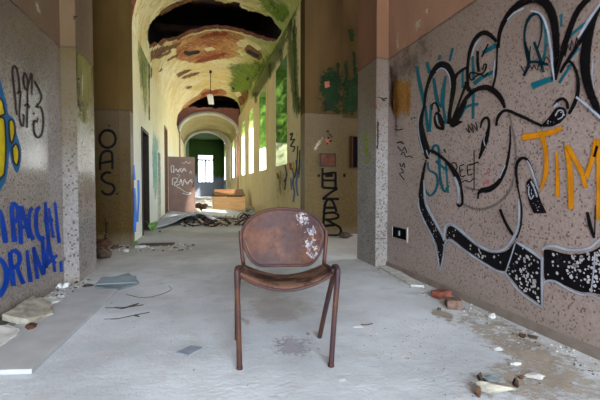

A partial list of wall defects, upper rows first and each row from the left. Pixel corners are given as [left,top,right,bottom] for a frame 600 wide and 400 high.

peeling [160,0,197,16]
peeling [150,31,262,64]
leakage [293,27,301,113]
peeling [181,87,249,110]